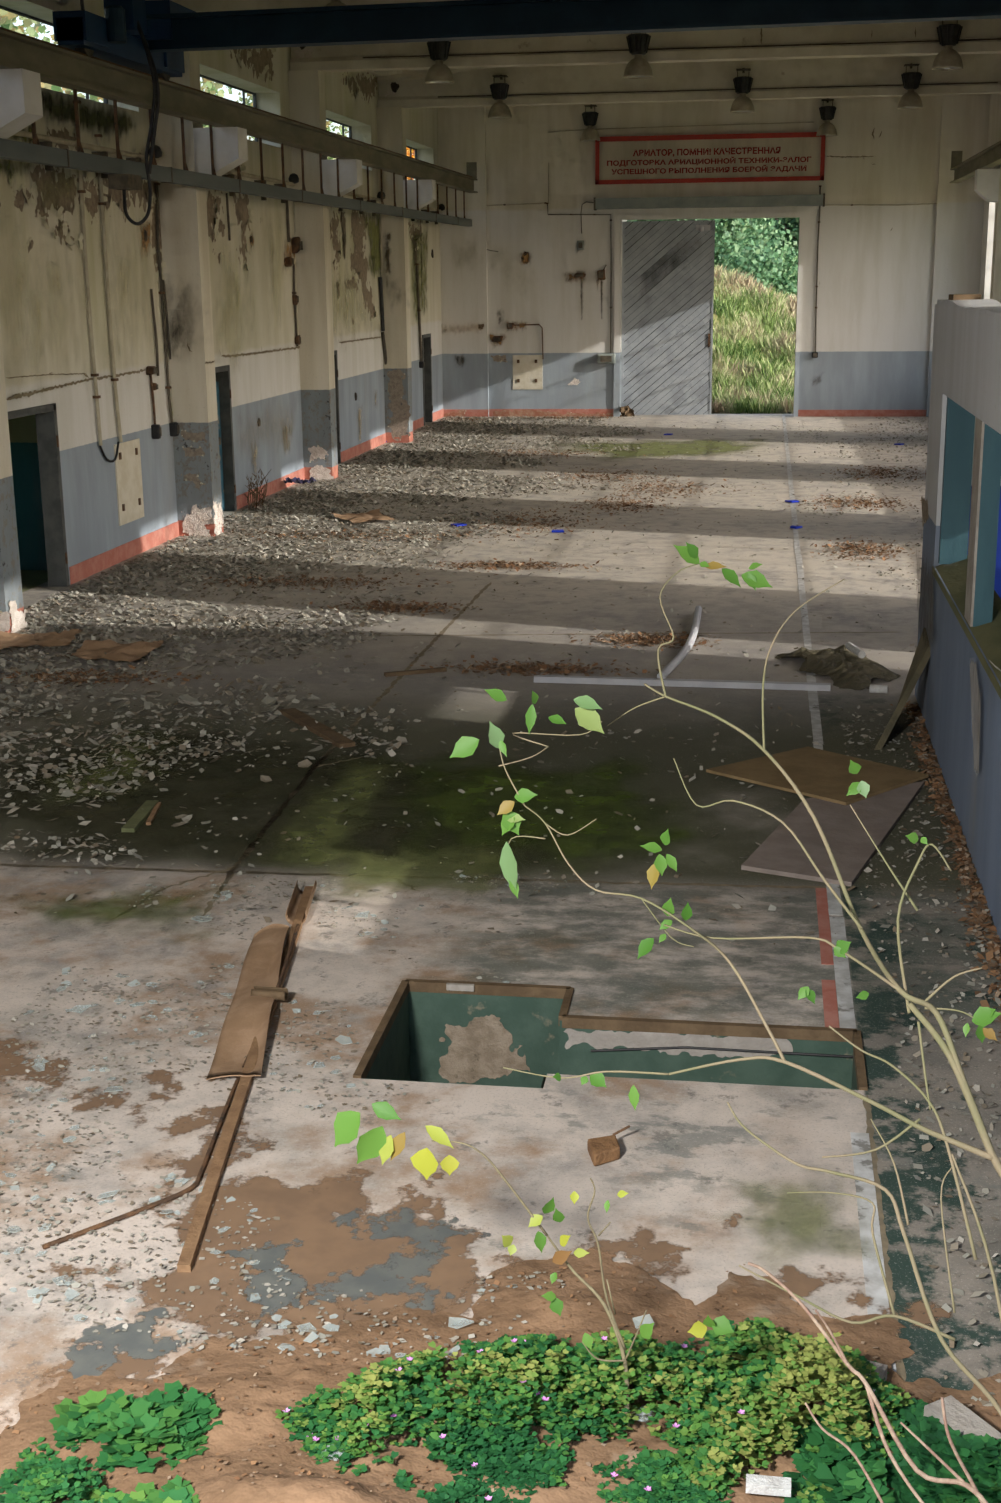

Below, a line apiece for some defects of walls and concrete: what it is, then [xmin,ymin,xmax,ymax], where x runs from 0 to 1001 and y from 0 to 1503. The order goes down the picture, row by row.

flaking render [387,369,411,441]
flaking render [308,445,334,480]
flaking render [181,501,224,536]